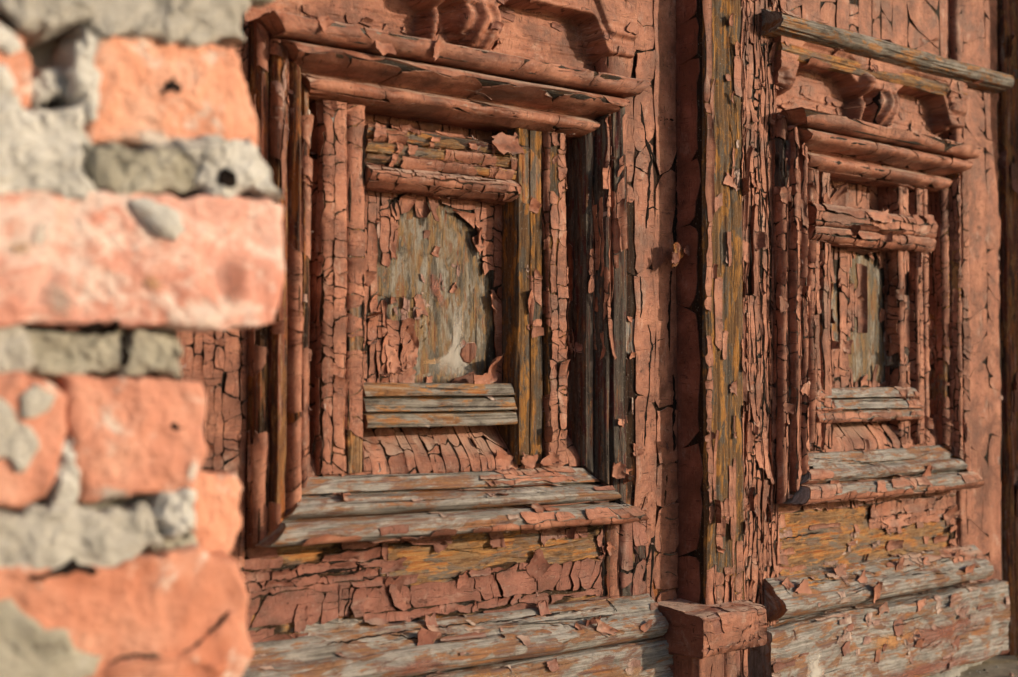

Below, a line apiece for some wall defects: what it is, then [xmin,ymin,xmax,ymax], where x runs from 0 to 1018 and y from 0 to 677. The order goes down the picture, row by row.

peeling [366,117,542,214]
peeling [364,202,502,384]
crack [601,102,678,612]
peeling [722,4,754,472]
peeling [779,282,811,415]
peeling [830,253,902,387]
peeling [461,450,568,500]
peeling [612,418,649,519]
spalling [100,609,243,677]
peeling [290,600,653,646]
peeling [378,524,616,596]
peeling [779,502,981,663]